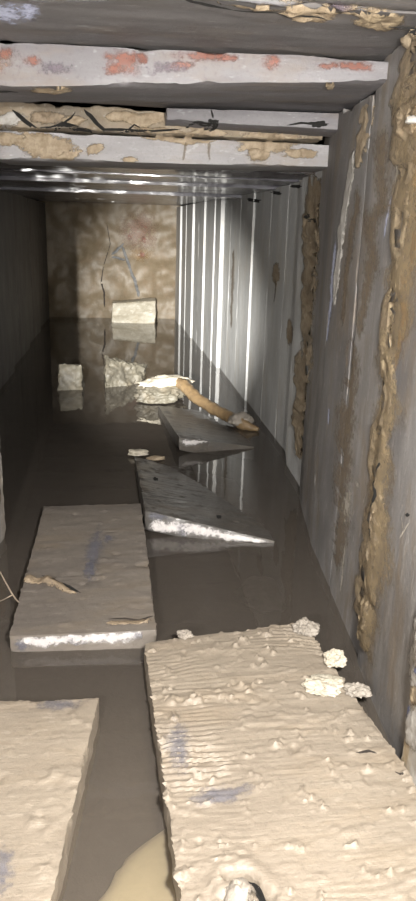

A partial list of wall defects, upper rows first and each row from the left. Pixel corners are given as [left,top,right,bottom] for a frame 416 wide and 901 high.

efflorescence [0,0,38,24]
peeling [279,12,336,23]
peeling [352,12,416,53]
corrosion [24,56,69,74]
corrosion [105,51,147,75]
corrosion [173,52,236,69]
corrosion [320,61,372,71]
spalling [0,111,87,146]
spalling [105,110,164,129]
spalling [186,109,219,132]
peeling [394,100,416,140]
peeling [405,616,416,751]